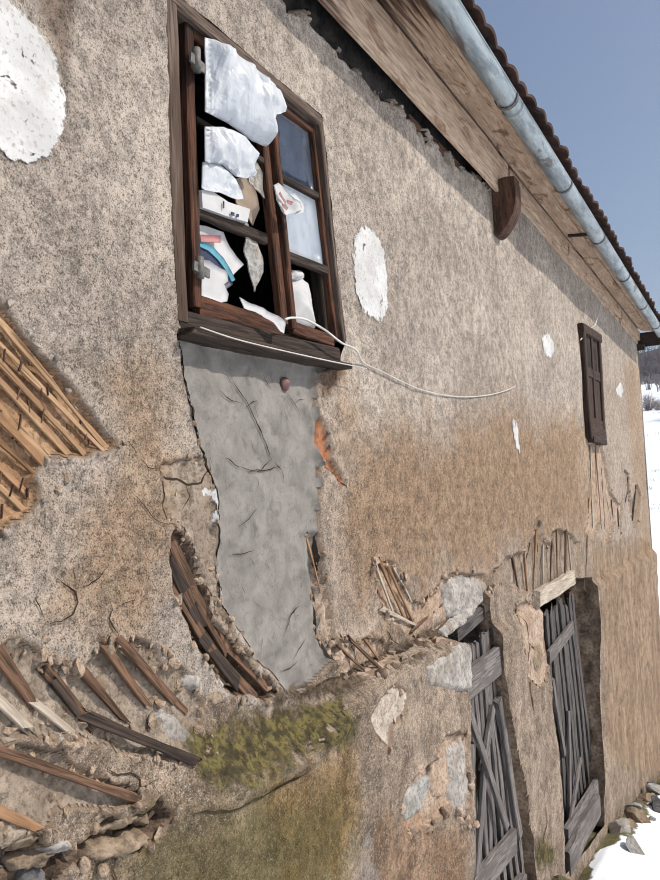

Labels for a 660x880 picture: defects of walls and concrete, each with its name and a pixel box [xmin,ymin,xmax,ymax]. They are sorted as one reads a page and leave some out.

flaking render [282,0,493,191]
crack [122,342,303,520]
flaking render [314,418,348,485]
flaking render [158,438,256,667]
peeling [19,636,85,689]
peeling [90,635,184,731]
peeling [189,630,220,679]
flaking render [304,531,408,754]
peeling [3,723,20,750]
peeling [29,708,60,761]
peeling [68,765,117,790]
peeling [62,842,118,879]